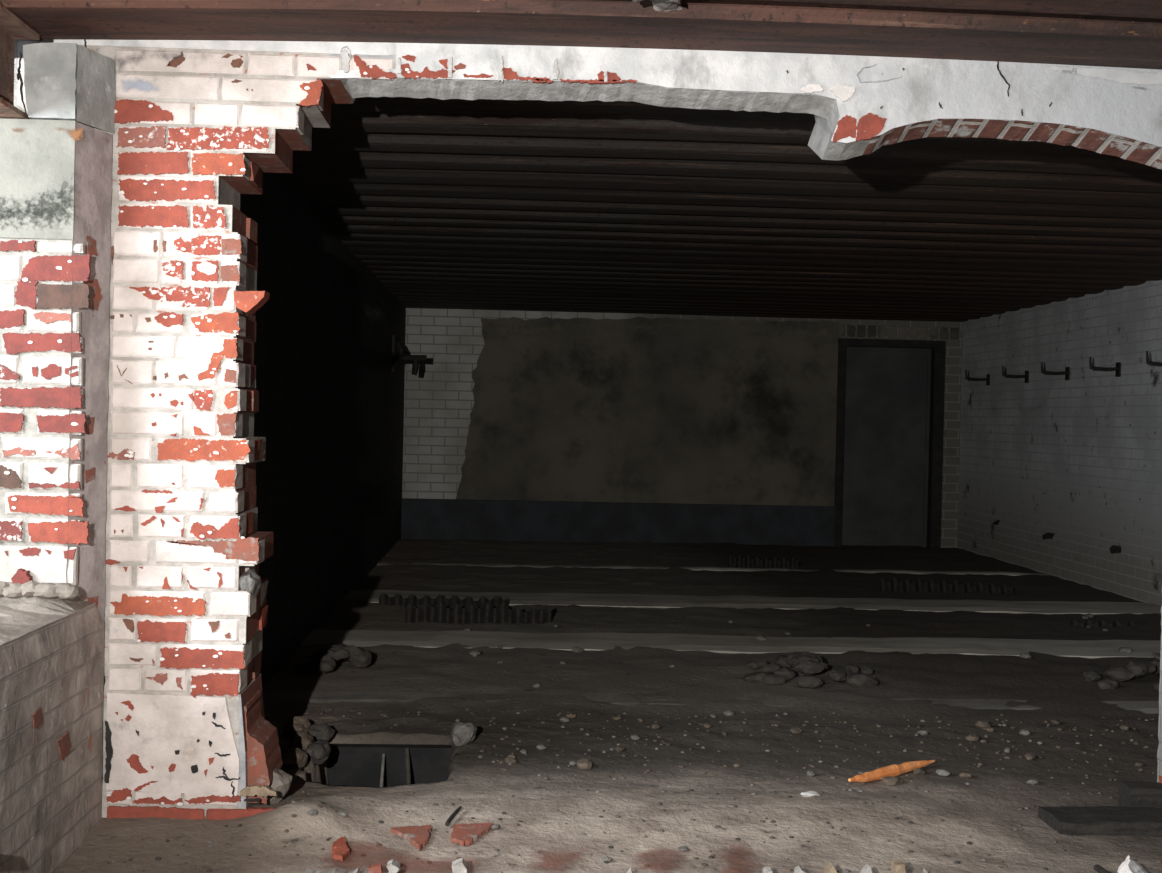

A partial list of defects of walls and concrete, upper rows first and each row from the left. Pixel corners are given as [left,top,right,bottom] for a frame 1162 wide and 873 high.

crack [17,52,27,114]
peeling [167,52,185,67]
peeling [222,54,253,92]
peeling [352,54,637,85]
crack [997,61,1052,116]
spalling [832,113,887,143]
leakage [0,187,73,225]
peeling [107,99,269,488]
peeling [0,236,114,584]
peeling [114,482,260,561]
peeling [87,572,245,698]
peeling [106,754,275,820]